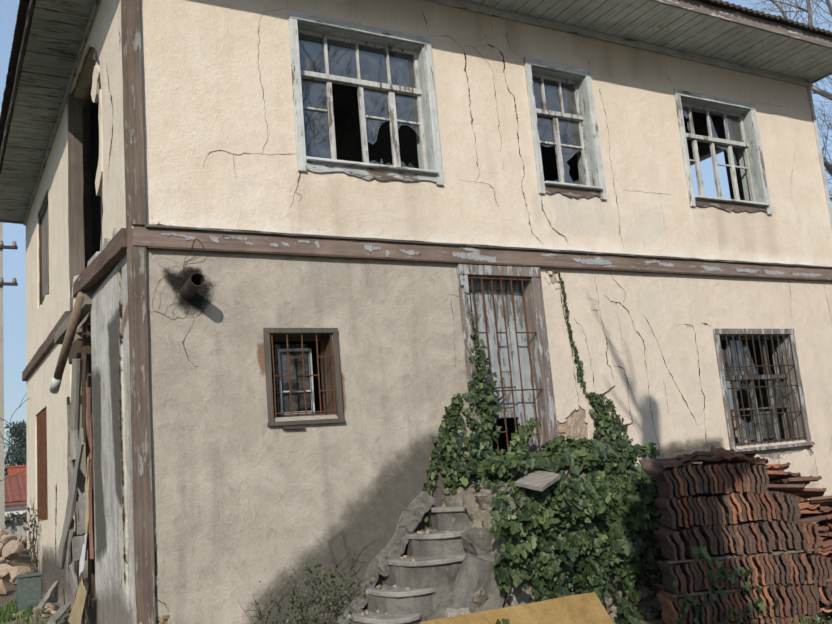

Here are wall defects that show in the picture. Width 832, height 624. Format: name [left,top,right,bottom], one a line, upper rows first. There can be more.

crack [204,6,289,173]
crack [422,12,568,243]
peeling [152,217,196,240]
peeling [209,235,253,245]
peeling [269,240,320,249]
peeling [364,245,420,257]
peeling [452,252,496,263]
damp [168,268,201,290]
peeling [735,268,822,277]
crack [148,258,209,367]
crack [553,273,711,450]
spalling [557,405,589,453]